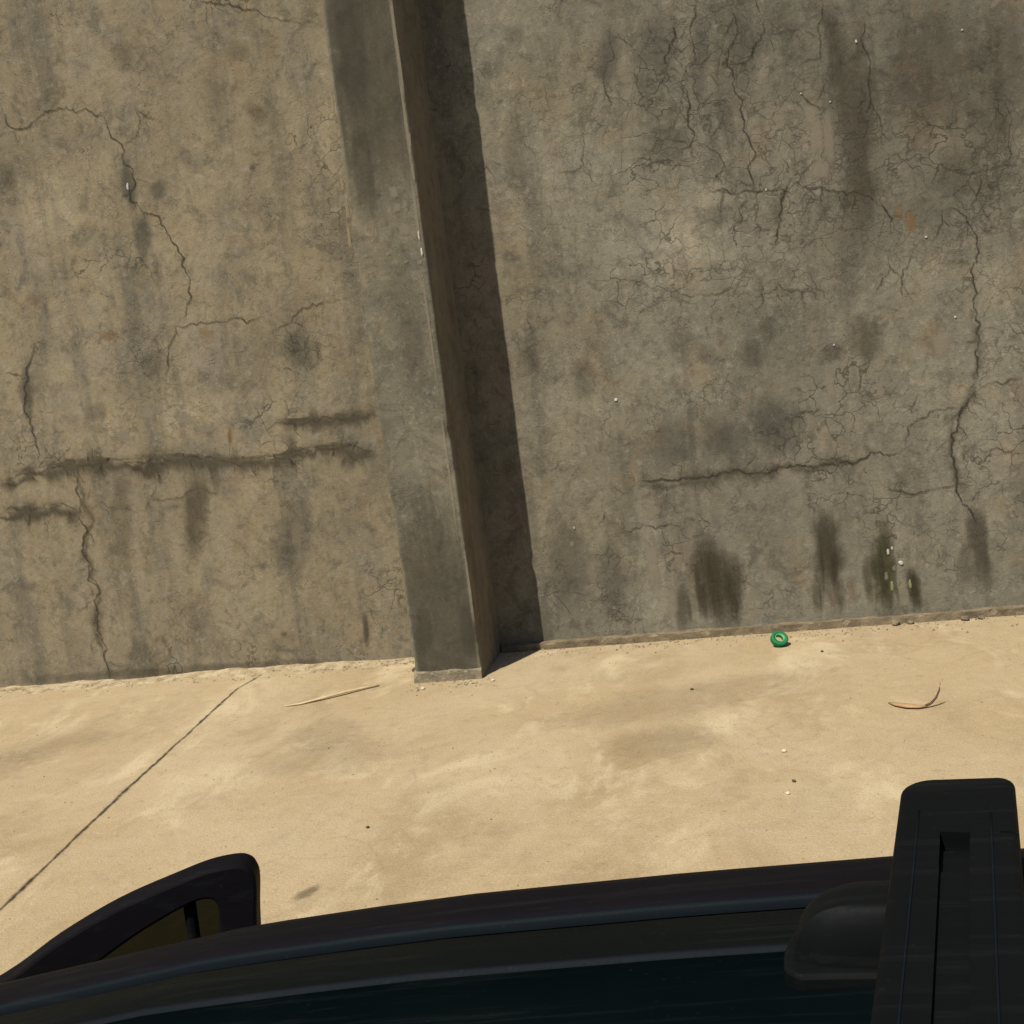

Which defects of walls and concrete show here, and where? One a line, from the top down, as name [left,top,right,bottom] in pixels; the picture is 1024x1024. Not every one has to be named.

crack [5,107,253,368]
crack [642,181,1012,515]
crack [0,342,369,678]
damp [818,524,840,575]
damp [876,532,892,601]
damp [908,574,920,605]